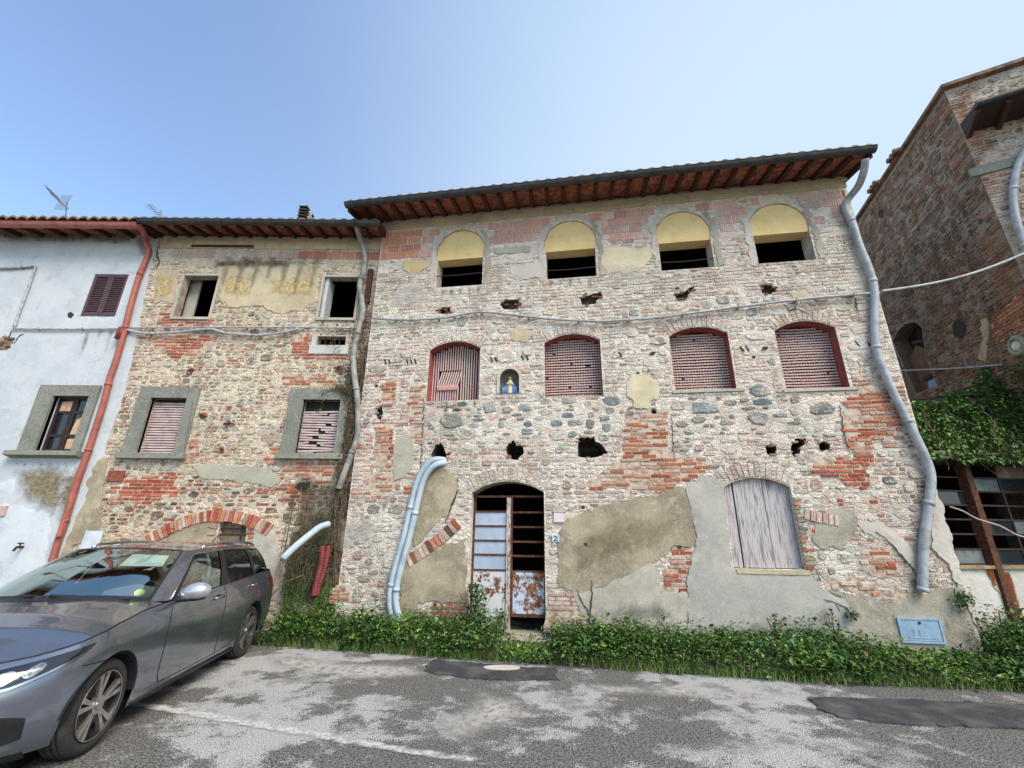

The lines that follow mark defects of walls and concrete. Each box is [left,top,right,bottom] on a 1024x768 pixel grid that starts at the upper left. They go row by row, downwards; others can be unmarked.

peeling [217,262,319,314]
spalling [501,298,522,310]
spalling [580,291,603,306]
spalling [674,287,696,300]
spalling [504,440,526,460]
water stain [22,468,75,509]
peeling [363,378,468,624]
peeling [543,374,981,658]
rust [493,571,545,618]